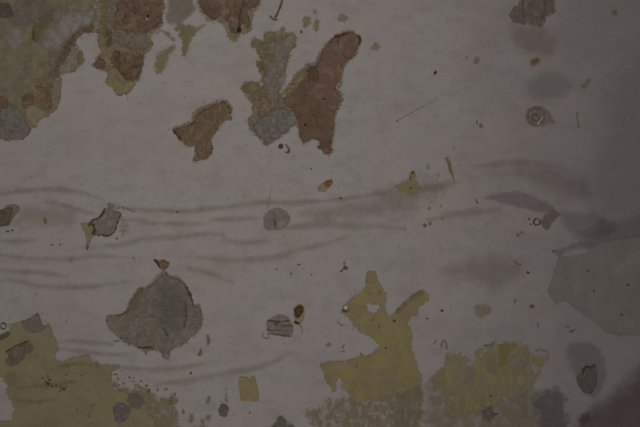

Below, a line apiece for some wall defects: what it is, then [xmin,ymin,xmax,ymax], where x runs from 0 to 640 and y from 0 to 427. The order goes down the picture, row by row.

peeling [0,0,165,141]
flaking render [172,100,232,163]
flaking render [197,0,262,42]
flaking render [240,27,362,155]
flaking render [81,207,121,249]
peeling [0,313,185,427]
flaking render [106,259,203,359]
peeling [238,375,259,402]
peeling [305,271,430,427]